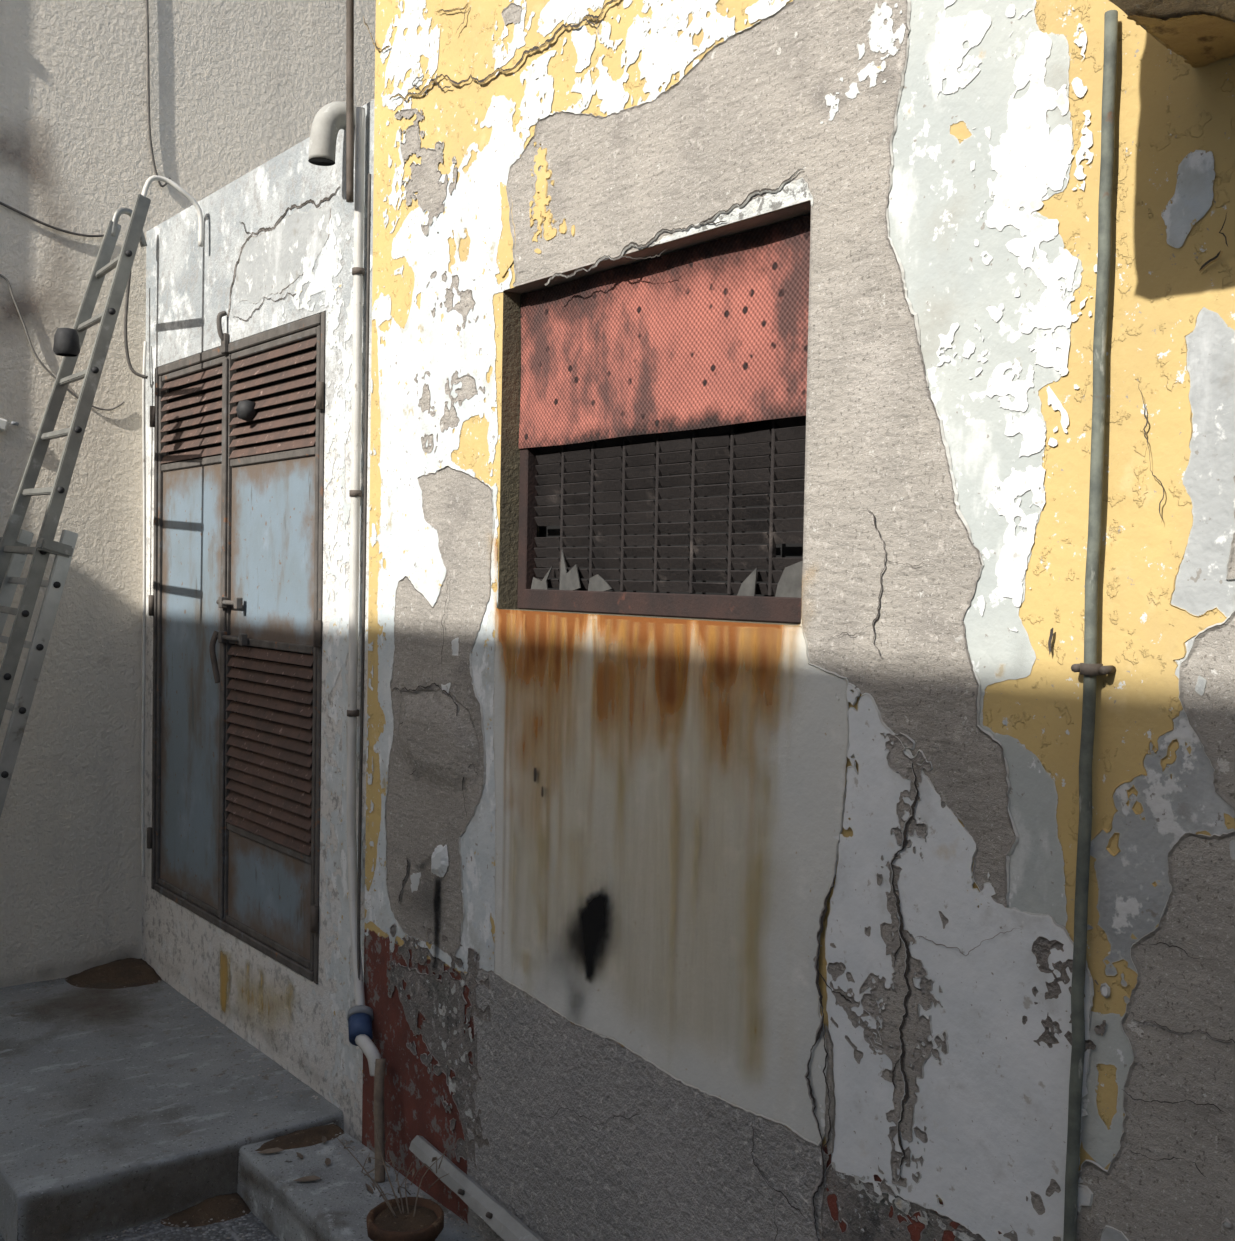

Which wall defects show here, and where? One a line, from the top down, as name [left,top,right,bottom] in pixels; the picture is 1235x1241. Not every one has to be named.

crack [364,18,390,51]
crack [389,0,617,101]
peeling [1123,14,1235,68]
peeling [1161,150,1215,248]
crack [227,186,340,321]
flaking render [242,0,1098,1241]
corrosion [495,603,786,762]
flaking render [1034,307,1235,1241]
crack [1137,942,1218,960]
crack [1133,1019,1235,1044]
crack [1127,1094,1224,1112]